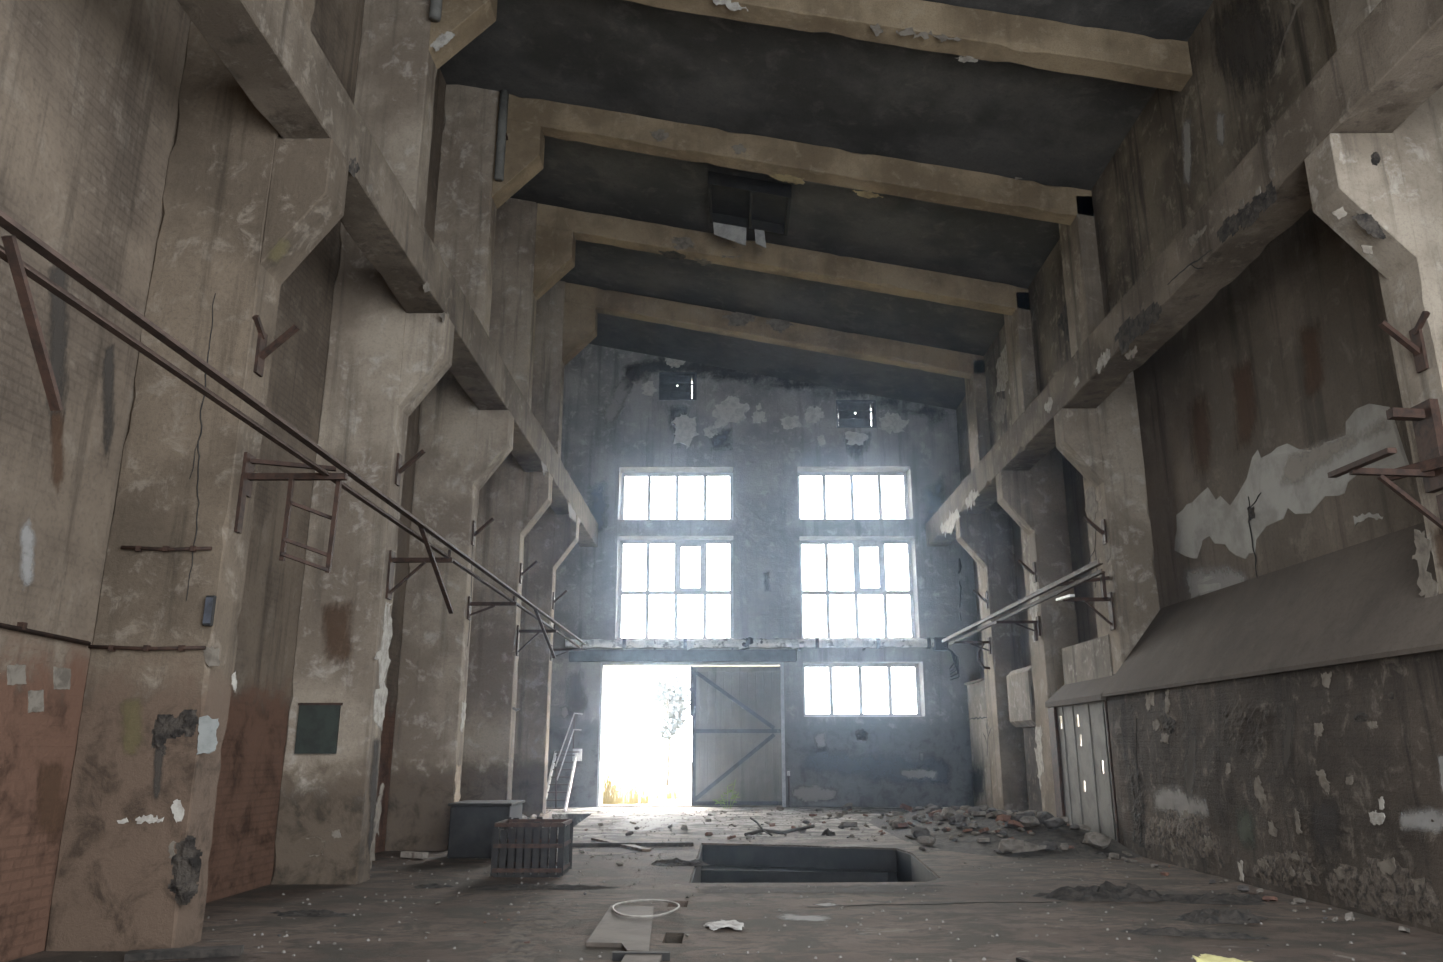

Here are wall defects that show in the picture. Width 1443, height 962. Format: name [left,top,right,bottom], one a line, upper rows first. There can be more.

flaking render [1174,404,1409,559]
spalling [151,709,199,756]
leakage [1155,789,1208,819]
leakage [1401,809,1443,831]
spalling [117,799,203,905]